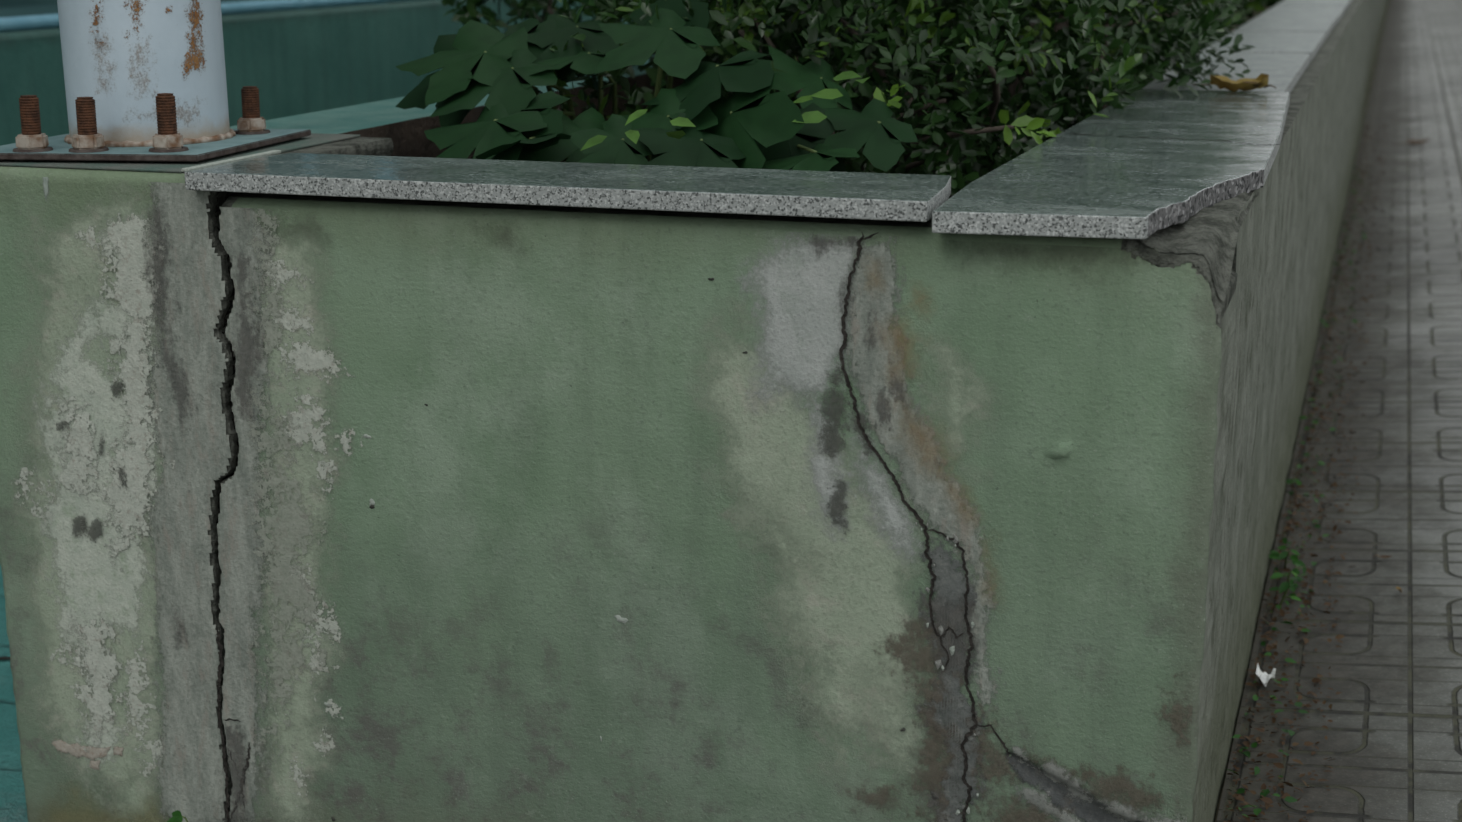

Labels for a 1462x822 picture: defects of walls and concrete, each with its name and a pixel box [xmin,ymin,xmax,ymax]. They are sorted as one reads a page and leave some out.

rust [124,0,146,38]
rust [166,0,207,77]
spalling [1126,191,1259,324]
crack [215,191,239,567]
peeling [11,182,371,822]
peeling [812,236,1002,822]
crack [839,231,1010,822]
crack [216,611,251,822]
leakage [847,618,1164,822]
spalling [1005,746,1187,822]